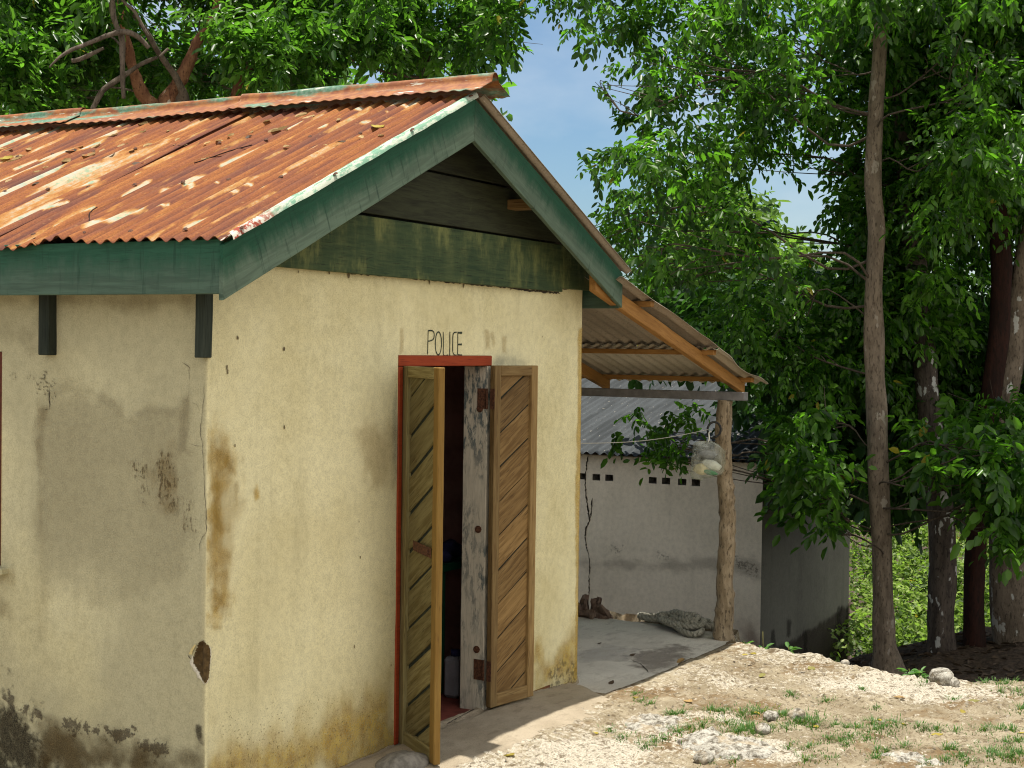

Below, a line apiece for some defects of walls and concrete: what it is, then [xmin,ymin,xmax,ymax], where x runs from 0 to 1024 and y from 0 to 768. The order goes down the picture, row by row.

spalling [188,640,211,684]
leakage [0,689,164,768]